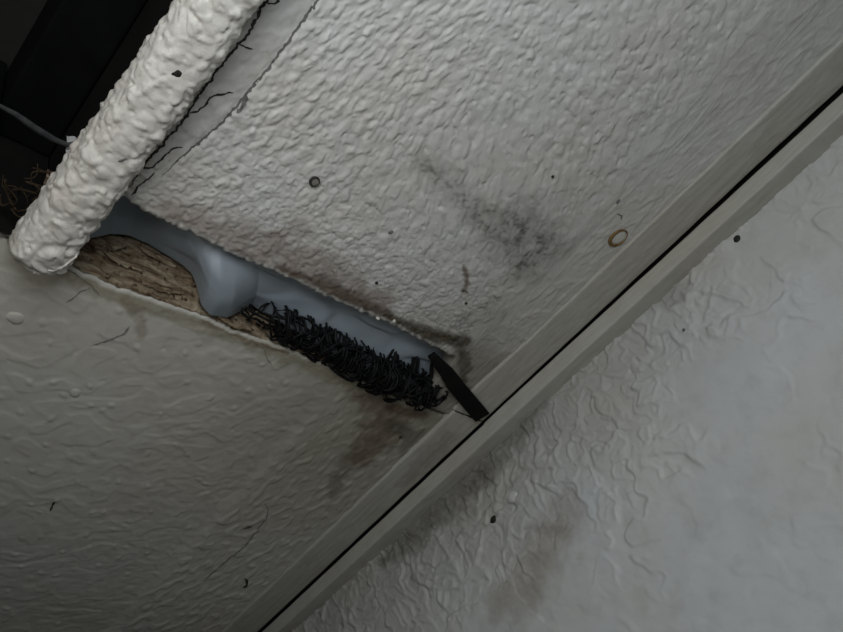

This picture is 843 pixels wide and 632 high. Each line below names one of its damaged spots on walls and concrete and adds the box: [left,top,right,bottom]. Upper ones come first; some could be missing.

spalling [47,234,415,401]